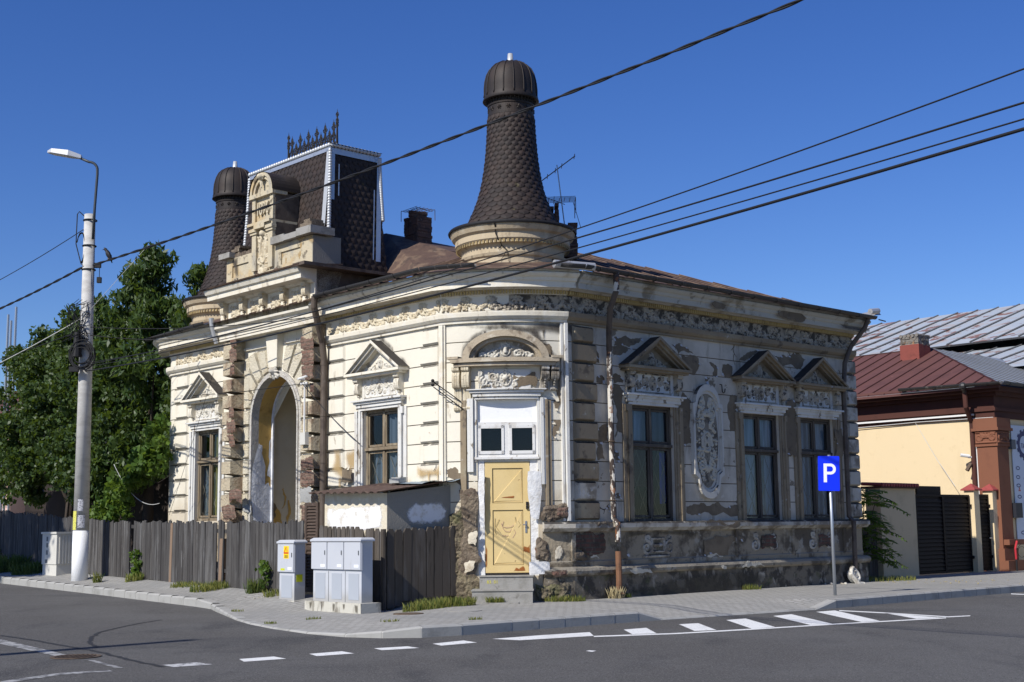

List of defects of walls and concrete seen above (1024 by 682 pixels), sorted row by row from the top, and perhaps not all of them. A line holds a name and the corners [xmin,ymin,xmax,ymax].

flaking render [613,336,643,357]
flaking render [673,343,759,385]
water stain [334,452,354,484]
water stain [417,467,439,481]
flaking render [540,503,572,522]
flaking render [447,467,482,600]
flaking render [535,537,563,561]
water stain [633,573,762,595]